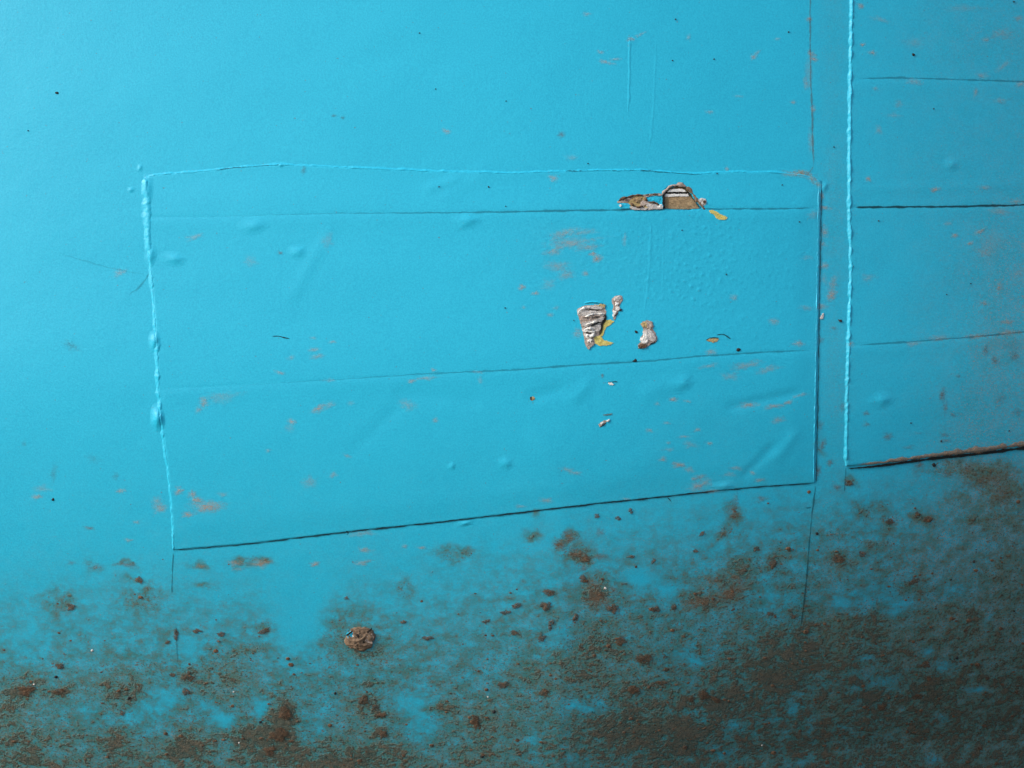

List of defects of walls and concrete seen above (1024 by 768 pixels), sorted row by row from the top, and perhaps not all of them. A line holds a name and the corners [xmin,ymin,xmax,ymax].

peeling [617,182,727,220]
peeling [577,295,623,349]
peeling [638,320,657,349]
corrosion [344,627,376,651]